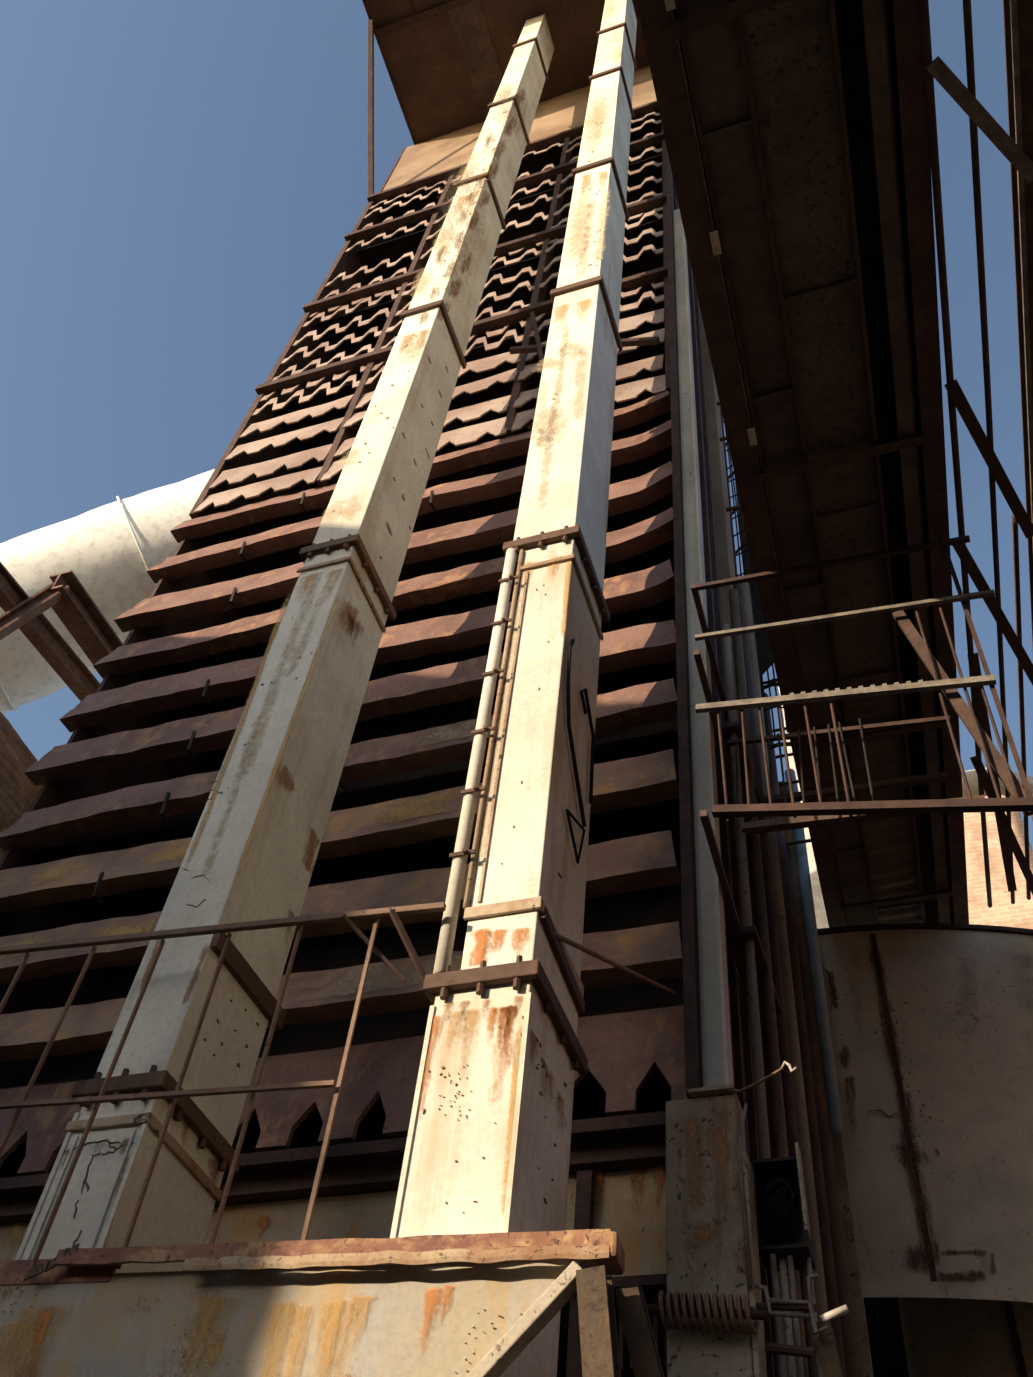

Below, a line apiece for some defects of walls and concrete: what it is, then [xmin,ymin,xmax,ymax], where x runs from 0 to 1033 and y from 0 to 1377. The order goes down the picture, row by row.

rust [469,928,528,965]
rust [422,996,564,1213]
crack [56,1138,134,1247]
rust [262,1296,373,1377]
rust [421,1285,453,1335]